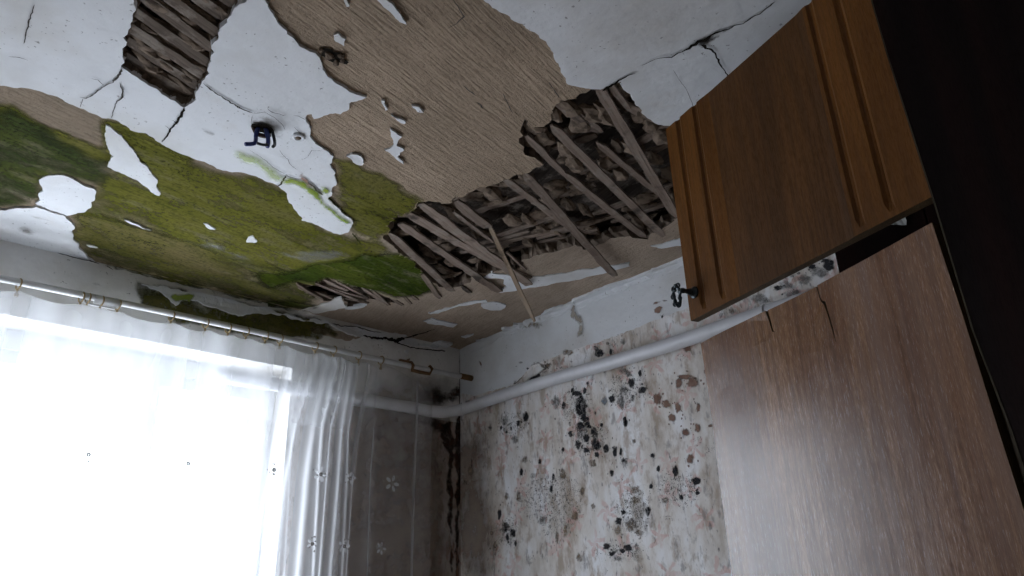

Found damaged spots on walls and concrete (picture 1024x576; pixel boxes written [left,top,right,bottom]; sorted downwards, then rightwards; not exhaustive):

crack [80,69,124,118]
crack [162,108,185,142]
spalling [267,0,591,210]
crack [603,2,774,105]
spalling [0,86,684,354]
mould [594,340,625,357]
leakage [327,346,715,576]